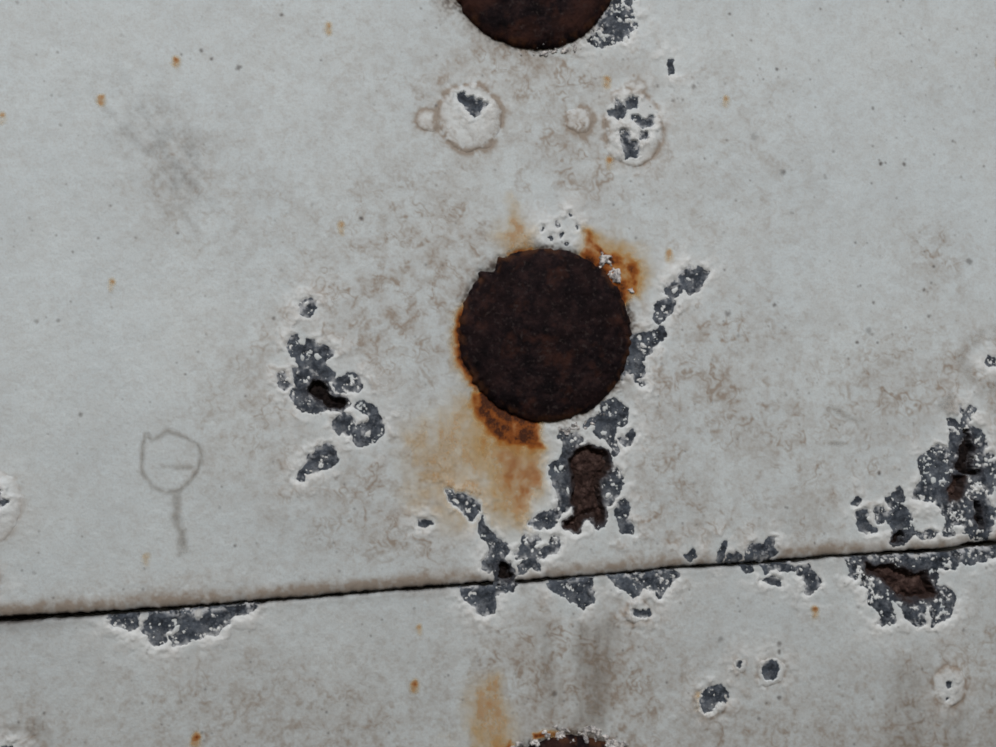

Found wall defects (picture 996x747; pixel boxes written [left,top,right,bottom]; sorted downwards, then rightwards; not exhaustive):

peeling [537,0,638,56]
peeling [457,91,489,118]
peeling [607,96,654,160]
rust [579,229,643,304]
peeling [621,265,710,387]
peeling [277,334,385,482]
rust [432,306,546,518]
peeling [445,397,697,618]
peeling [843,405,996,628]
peeling [716,536,822,596]
peeling [107,602,260,647]
peeling [699,684,729,714]